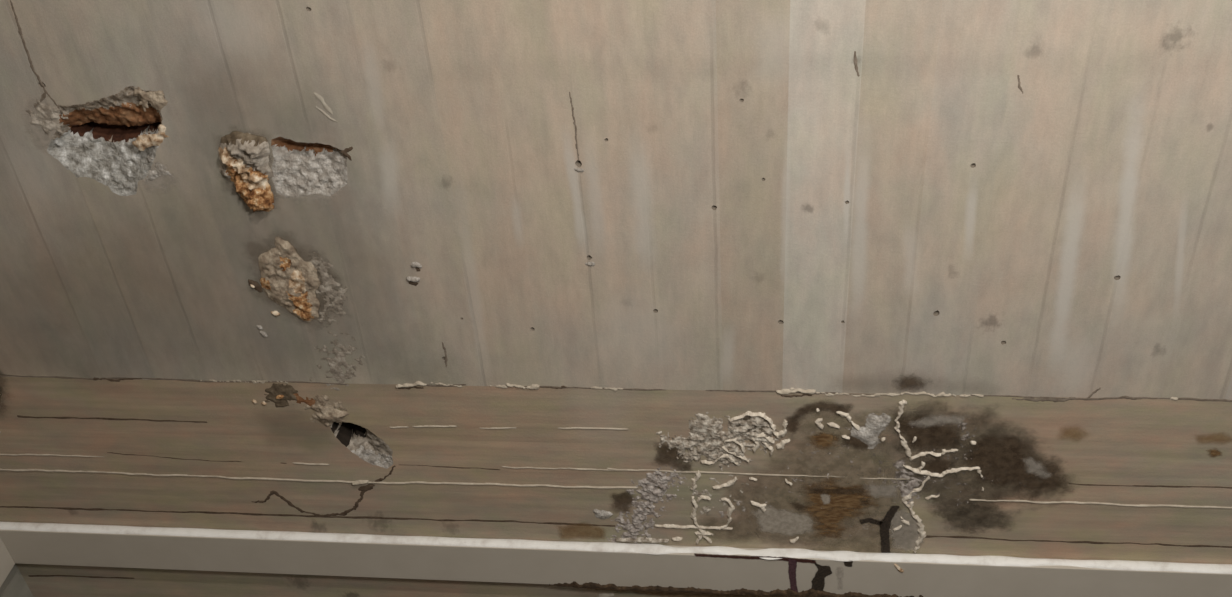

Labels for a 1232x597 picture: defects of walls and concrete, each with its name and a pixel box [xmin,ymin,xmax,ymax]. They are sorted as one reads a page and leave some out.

crack [10,0,63,114]
spalling [25,86,173,196]
spalling [271,137,353,198]
spalling [330,422,393,469]
crack [251,465,395,517]
leakage [606,403,1064,592]
rust [549,581,923,597]